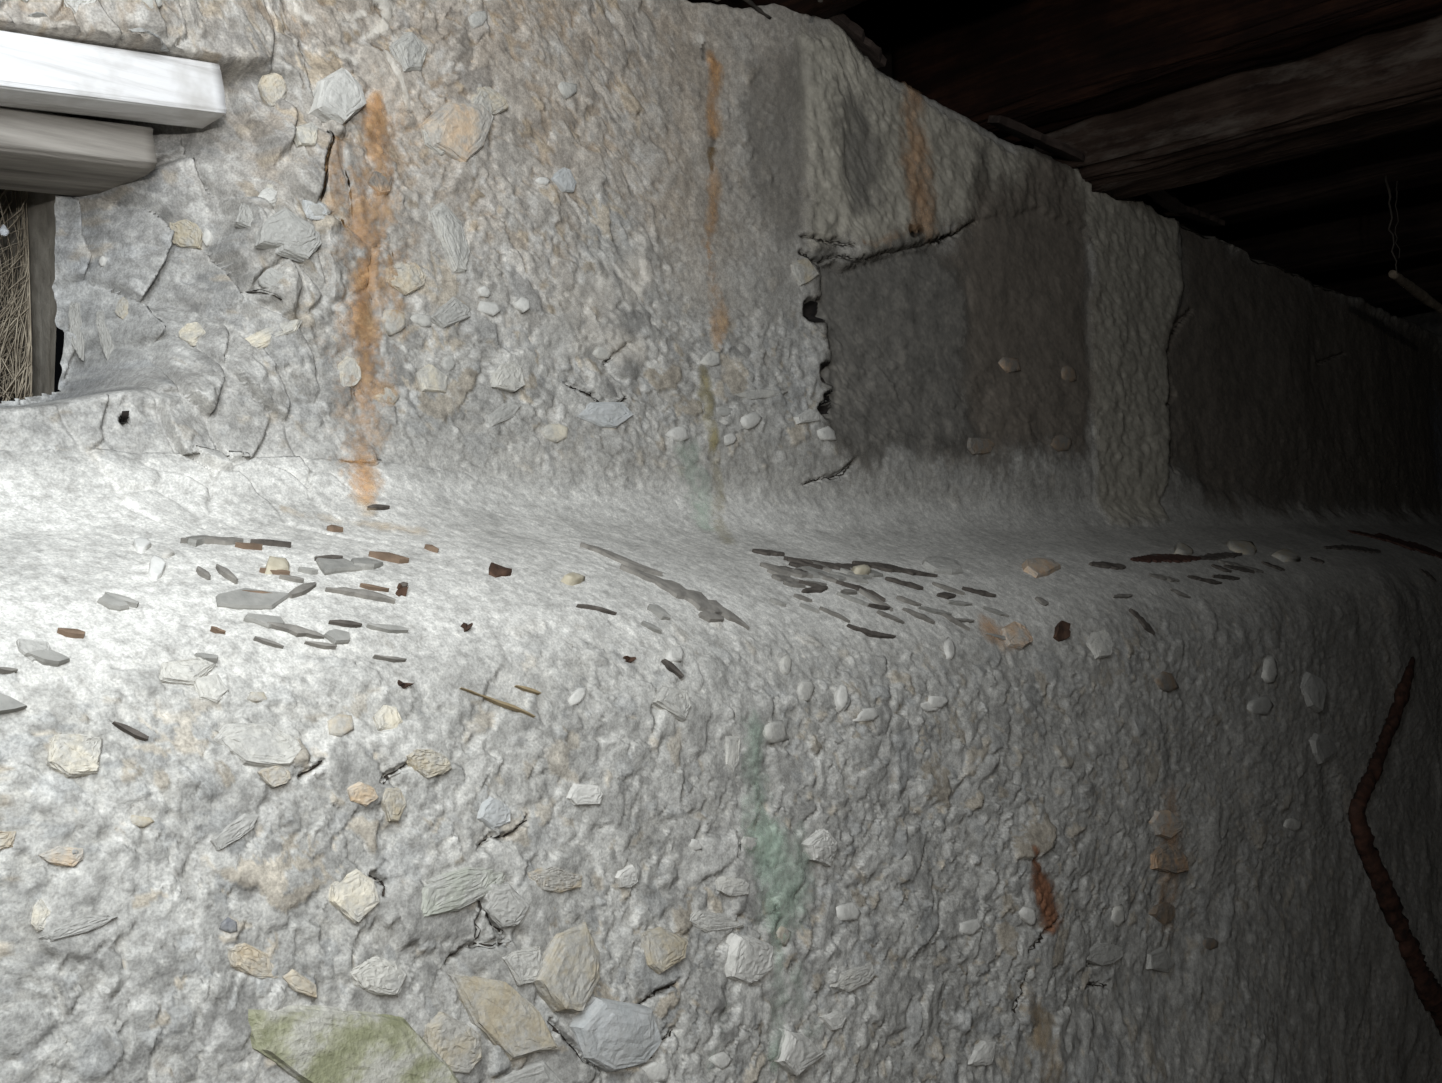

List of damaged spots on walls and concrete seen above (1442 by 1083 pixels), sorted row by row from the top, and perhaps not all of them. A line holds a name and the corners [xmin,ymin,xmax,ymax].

corrosion [903,82,934,231]
spalling [797,25,1185,524]
corrosion [1032,846,1058,934]
corrosion [1348,656,1442,1036]